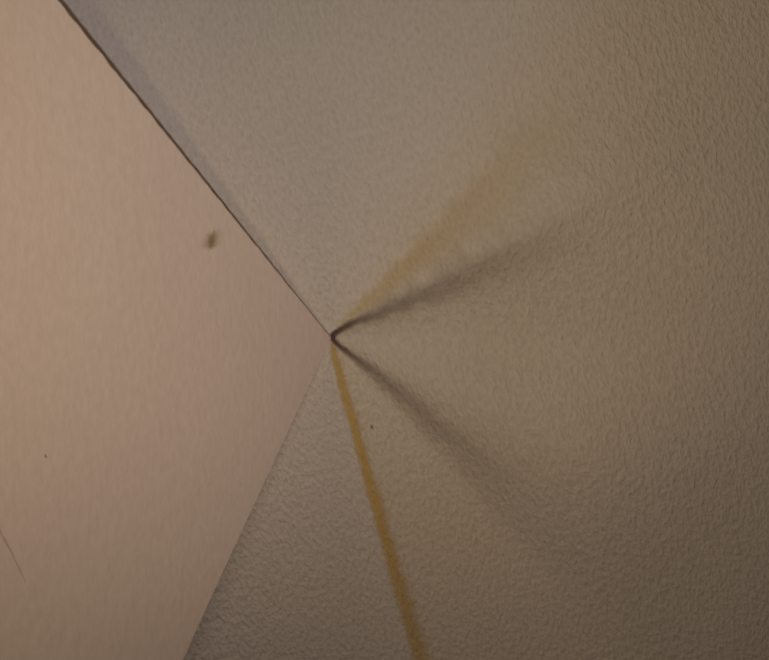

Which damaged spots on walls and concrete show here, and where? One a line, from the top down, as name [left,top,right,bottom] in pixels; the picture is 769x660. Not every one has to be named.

water stain [332,347,417,650]